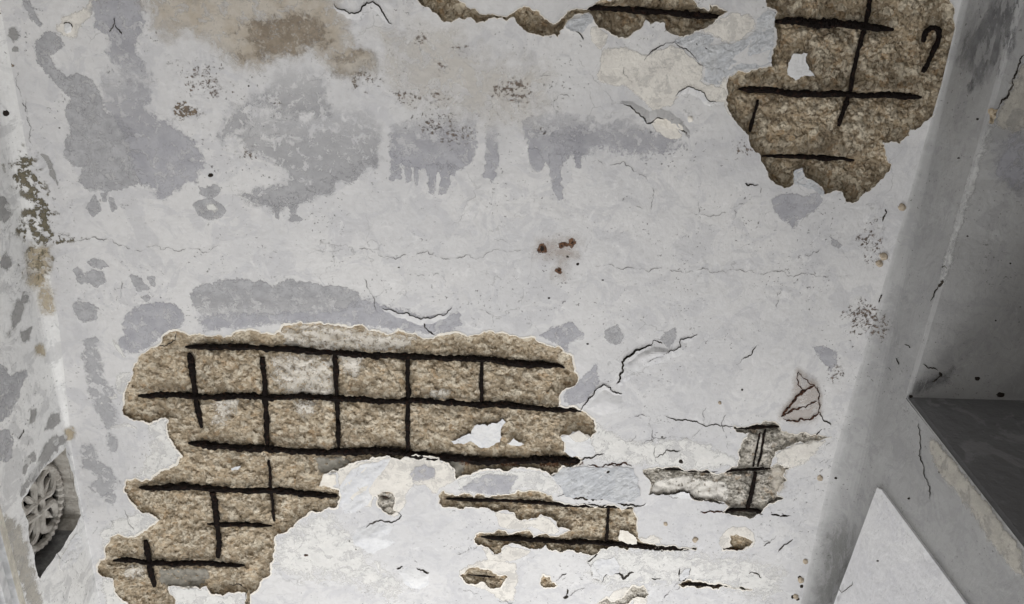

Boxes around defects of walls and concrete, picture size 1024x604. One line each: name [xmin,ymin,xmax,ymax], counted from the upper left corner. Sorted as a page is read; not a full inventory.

leakage [151,0,381,93]
crack [333,1,392,25]
leakage [172,63,222,121]
spalling [417,0,956,227]
leakage [525,127,587,200]
leakage [8,151,75,313]
crack [366,281,452,335]
spalling [82,274,831,604]
crack [581,335,697,411]
crack [781,372,831,435]
crack [918,424,931,499]